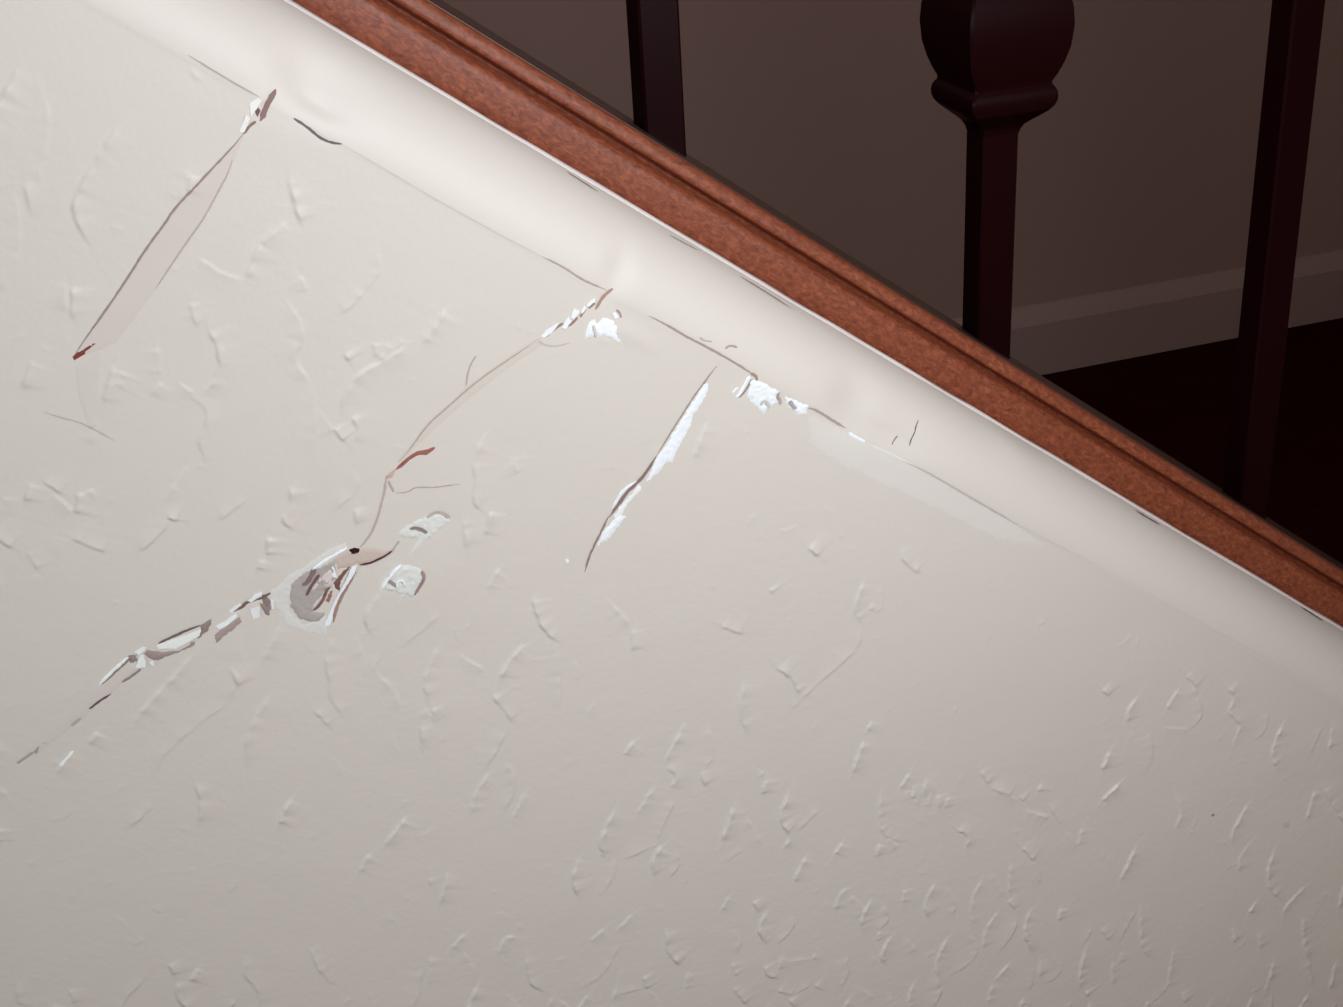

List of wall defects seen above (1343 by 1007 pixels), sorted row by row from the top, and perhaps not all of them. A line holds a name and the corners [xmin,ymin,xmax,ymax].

crack [75,56,846,623]
crack [45,412,113,440]
flaking render [128,592,274,668]
peeling [325,565,357,626]
crack [72,625,201,726]